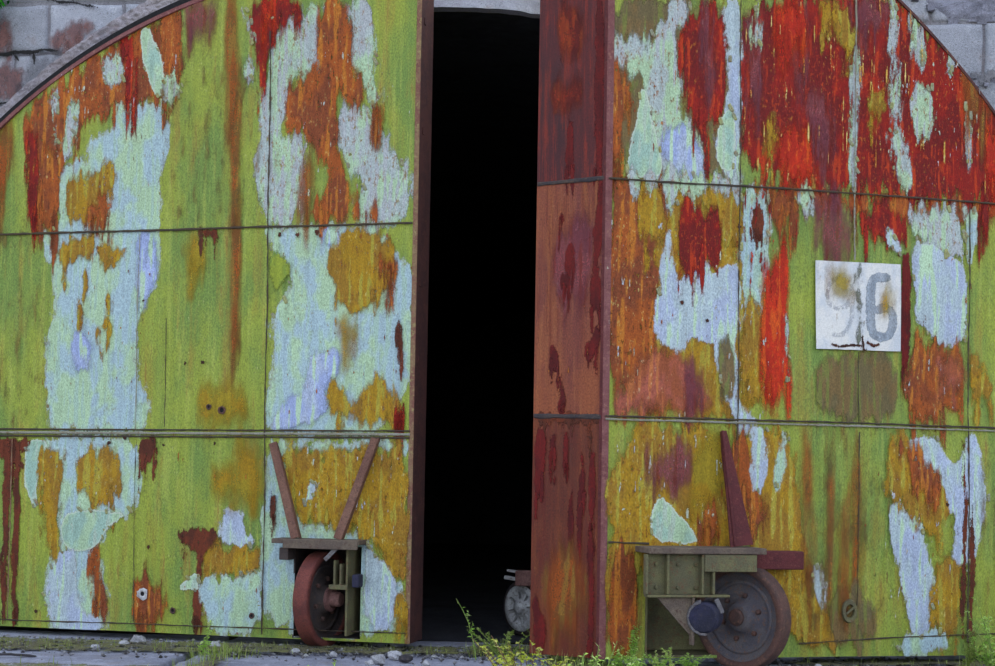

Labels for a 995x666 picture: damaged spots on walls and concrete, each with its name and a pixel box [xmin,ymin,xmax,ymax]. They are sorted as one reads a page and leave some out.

rust [0,437,122,630]
rust [0,10,184,360]
peeling [23,27,184,630]
rust [137,437,165,491]
rust [178,526,260,635]
peeling [180,0,414,640]
rust [282,0,411,643]
peeling [650,482,717,546]
peeling [614,0,792,494]
rust [532,0,995,658]
peeling [885,490,948,656]
peeling [910,432,990,570]